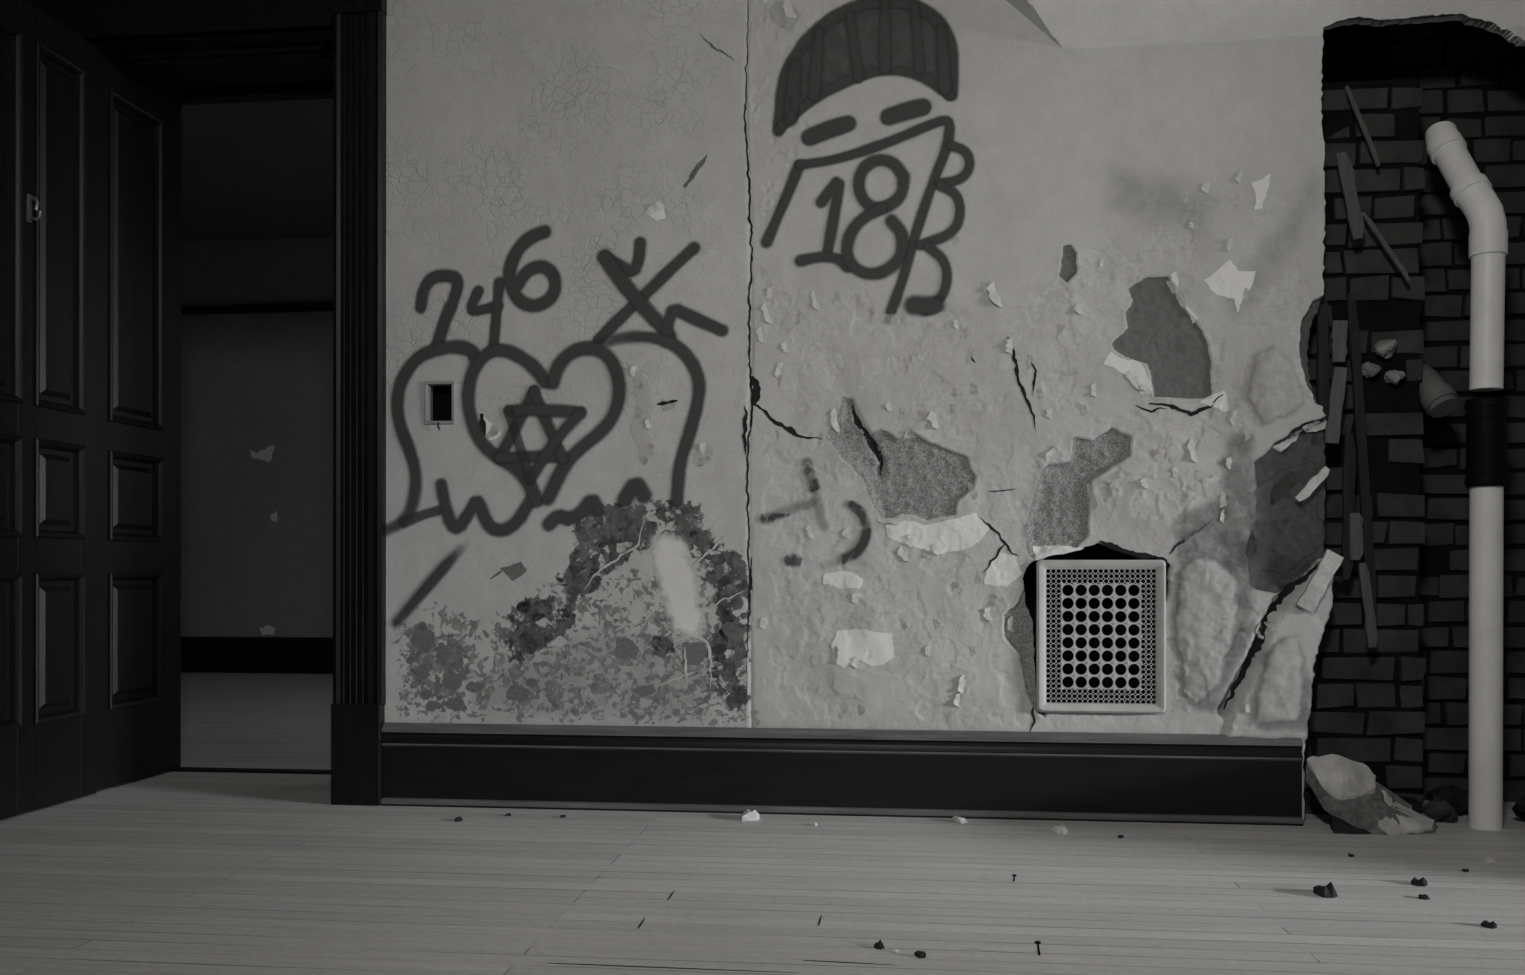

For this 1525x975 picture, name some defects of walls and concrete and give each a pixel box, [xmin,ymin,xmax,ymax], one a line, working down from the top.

flaking render [1236,171,1271,210]
flaking render [1059,245,1077,283]
flaking render [1204,238,1256,313]
flaking render [1103,271,1252,441]
flaking render [826,384,990,562]
peeling [1153,432,1234,523]
flaking render [1246,296,1327,593]
damp [395,500,753,727]
flaking render [823,570,864,604]
flaking render [831,618,908,668]
flaking render [952,428,1131,716]
peeling [1256,611,1285,639]